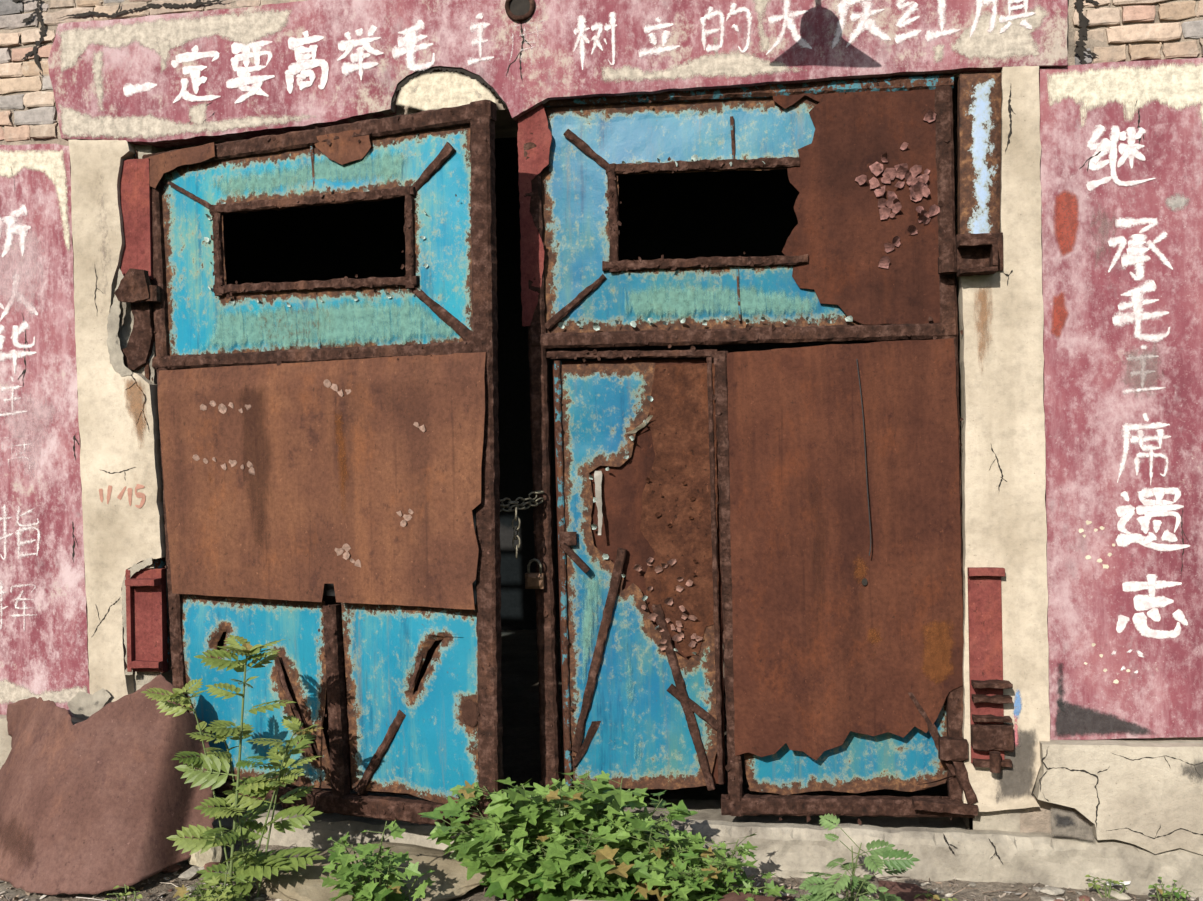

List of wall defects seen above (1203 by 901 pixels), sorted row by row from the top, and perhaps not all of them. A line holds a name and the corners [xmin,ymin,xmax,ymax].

peeling [933,7,1046,62]
peeling [1047,0,1203,125]
peeling [0,0,315,249]
rust [923,109,936,123]
rust [855,142,940,269]
rust [200,401,252,414]
rust [323,379,351,397]
rust [192,454,255,475]
rust [396,509,414,527]
rust [335,543,361,567]
rust [923,622,953,682]
crack [1039,746,1203,839]